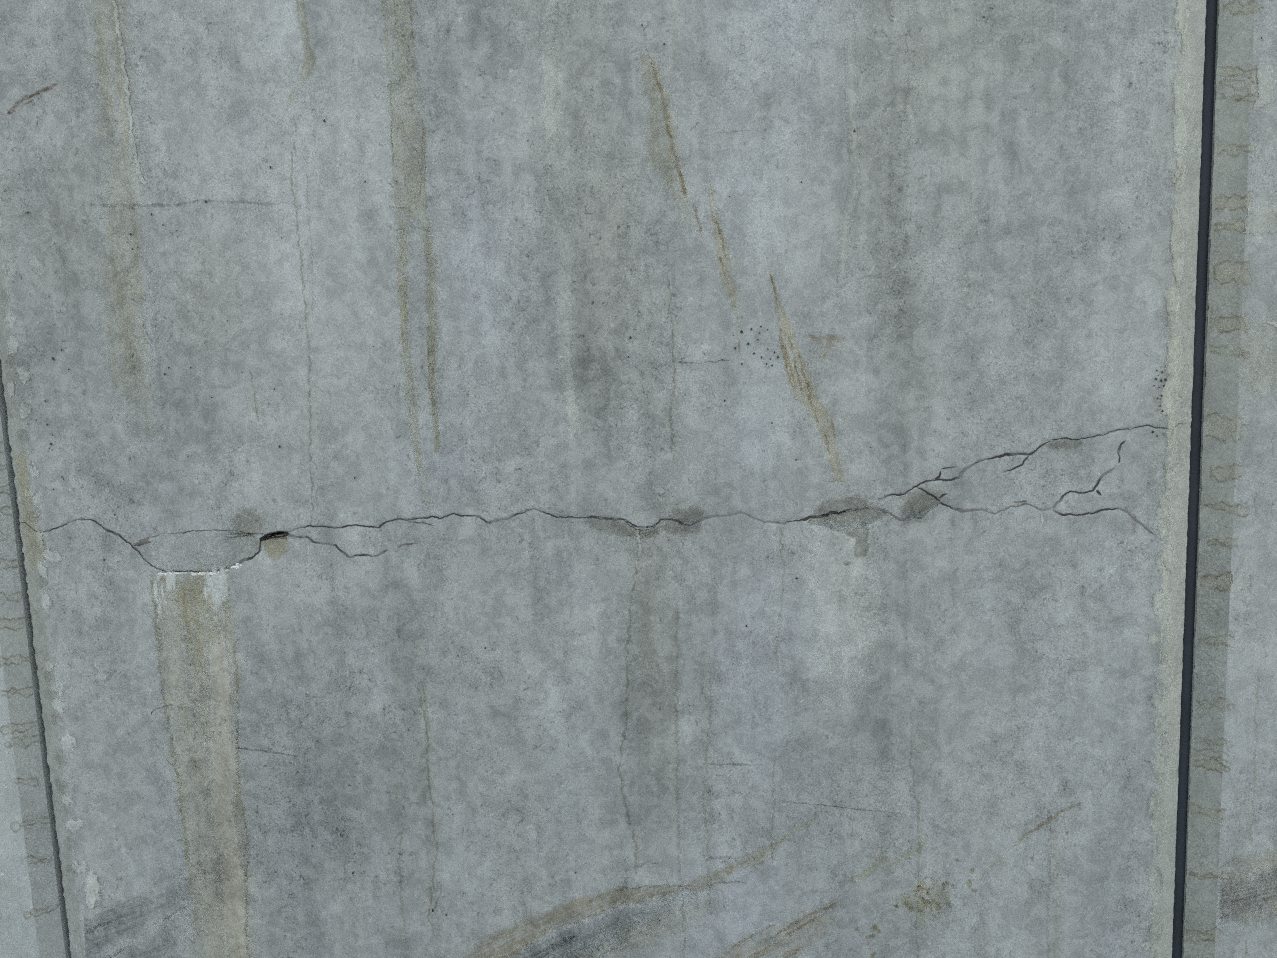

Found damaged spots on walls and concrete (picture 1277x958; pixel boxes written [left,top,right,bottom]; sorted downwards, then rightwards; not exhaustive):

crack [21,423,1186,572]
efflorescence [154,563,242,613]
water stain [209,640,246,958]